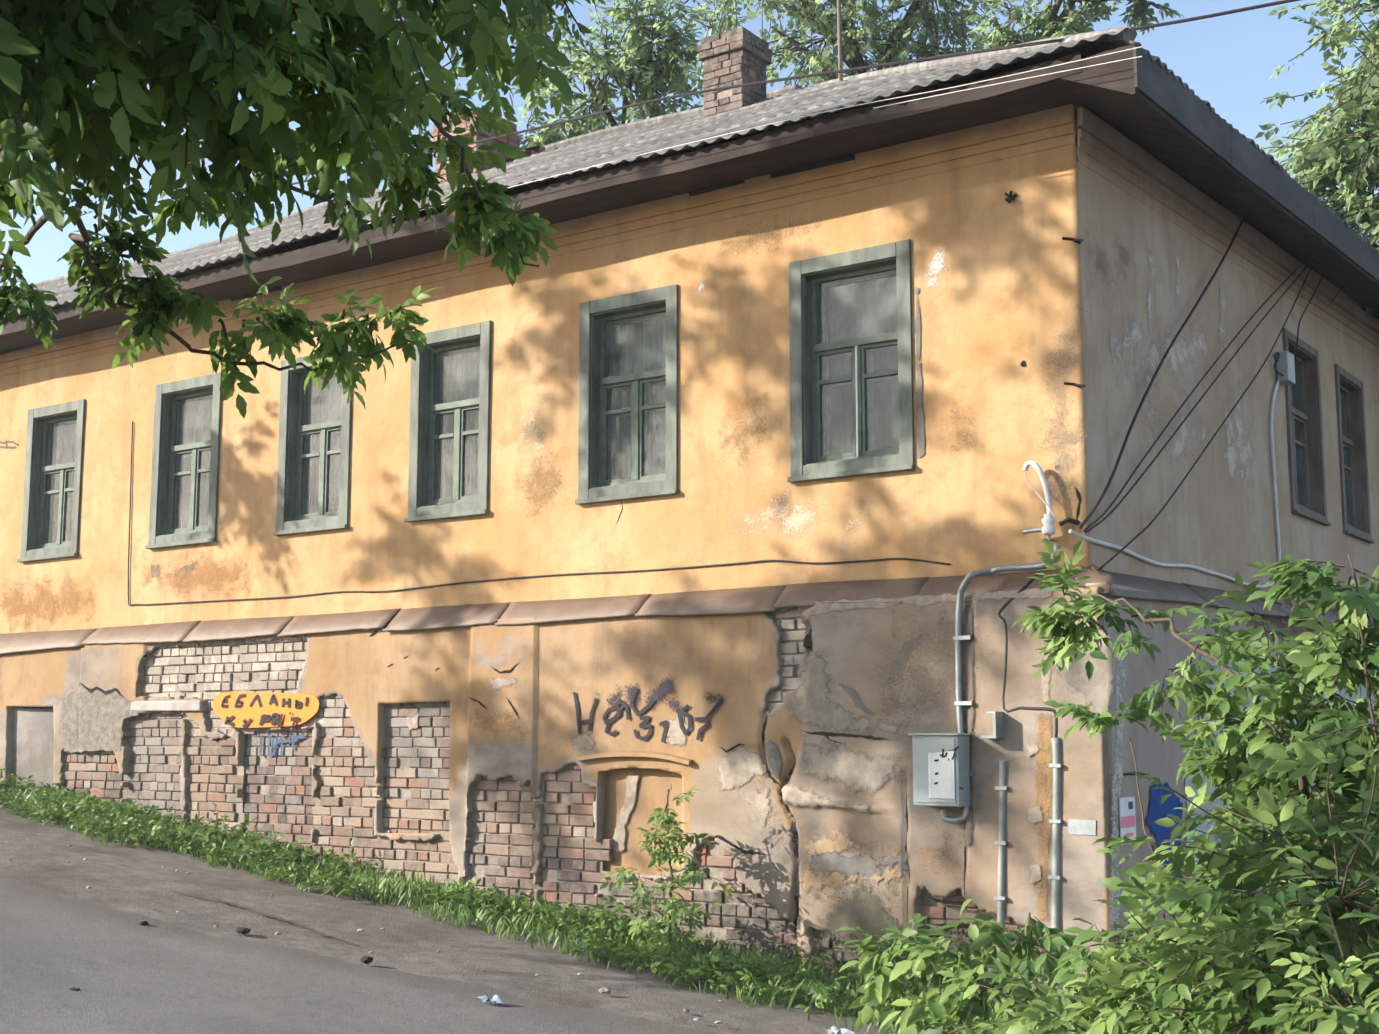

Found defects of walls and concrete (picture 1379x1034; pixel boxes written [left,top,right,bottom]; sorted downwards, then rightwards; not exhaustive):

water stain [517,404,562,507]
water stain [1046,333,1081,499]
flaking render [53,635,909,971]
crack [707,717,889,968]